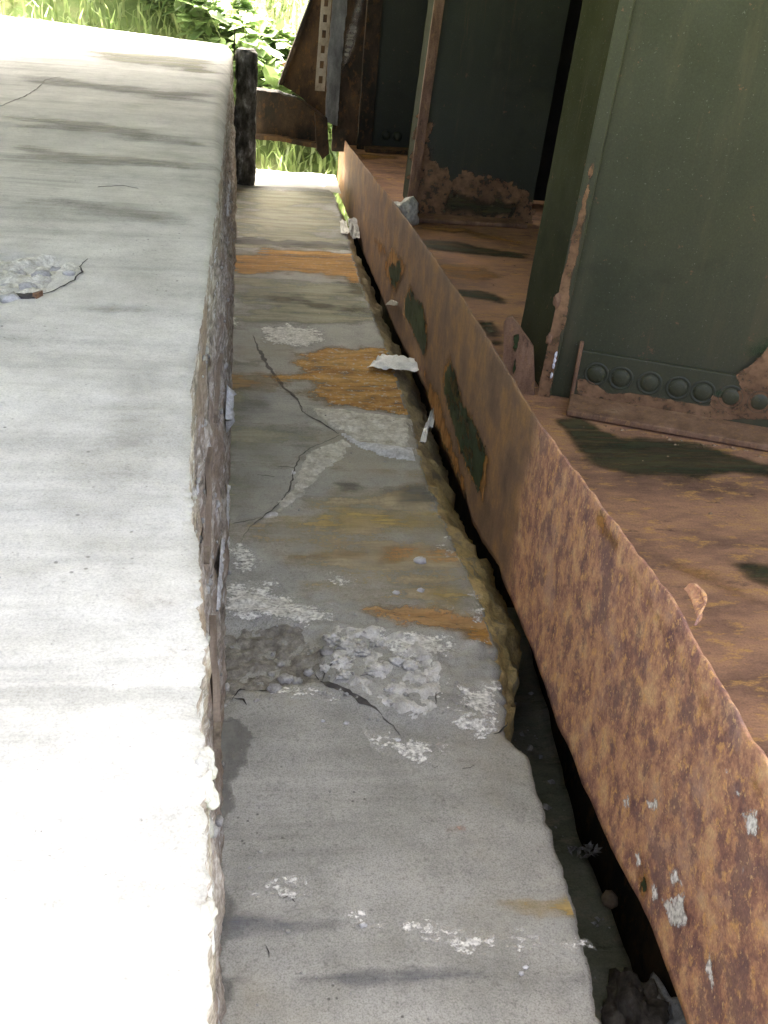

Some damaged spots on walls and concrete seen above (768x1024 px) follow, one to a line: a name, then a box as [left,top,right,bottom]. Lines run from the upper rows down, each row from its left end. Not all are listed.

corrosion [234,248,360,283]
leakage [233,277,374,347]
spalling [340,215,401,356]
crack [232,336,339,566]
corrosion [423,355,488,501]
leakage [225,523,338,628]
leakage [287,474,484,623]
spalling [264,370,522,742]
corrosion [363,605,492,645]
corrosion [684,583,707,625]
crack [315,663,398,732]
leakage [447,679,501,740]